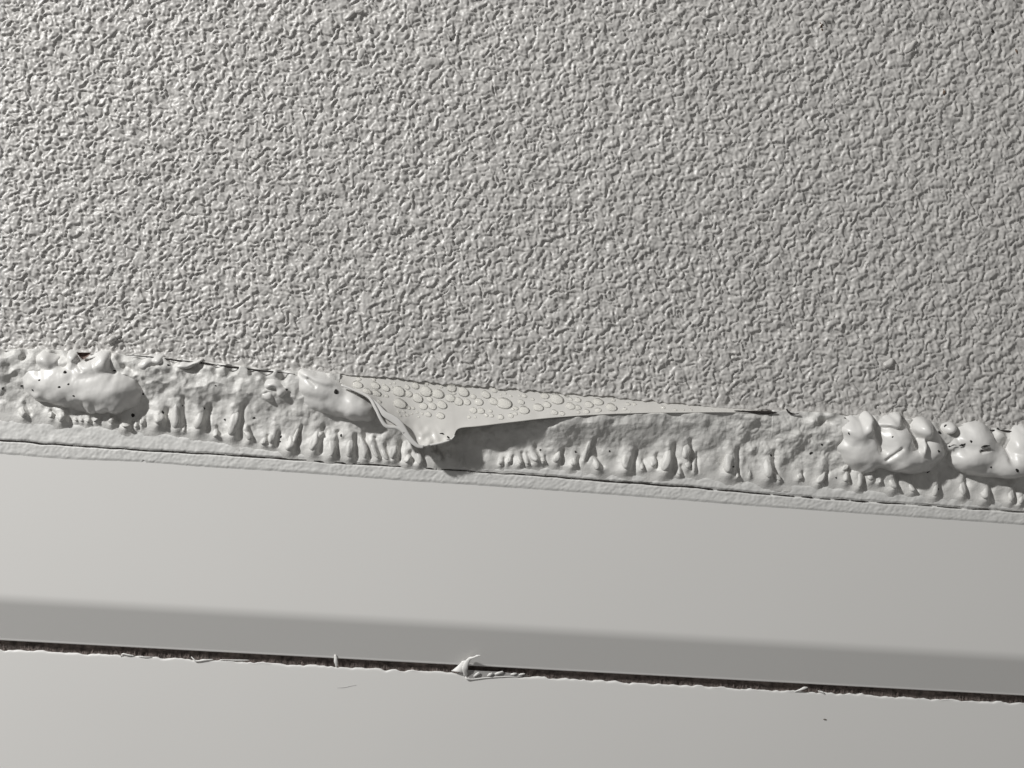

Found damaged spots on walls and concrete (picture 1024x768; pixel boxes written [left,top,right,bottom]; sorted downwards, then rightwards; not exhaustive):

peeling [340,374,771,448]
peeling [452,655,529,680]